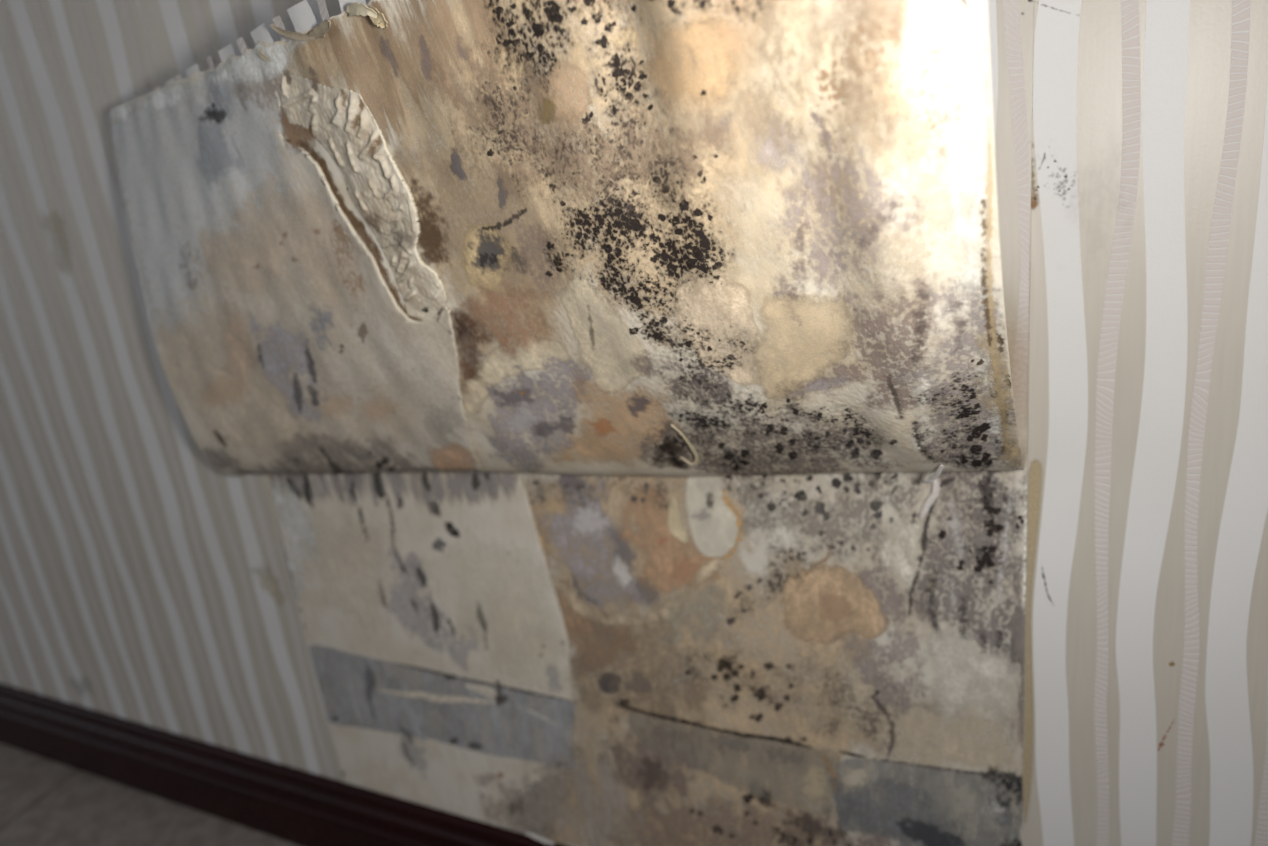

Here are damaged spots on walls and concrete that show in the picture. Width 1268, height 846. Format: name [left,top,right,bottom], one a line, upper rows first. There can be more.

water stain [111,0,1041,846]
peeling [378,684,496,706]
crack [614,699,1021,781]
peeling [525,832,555,845]